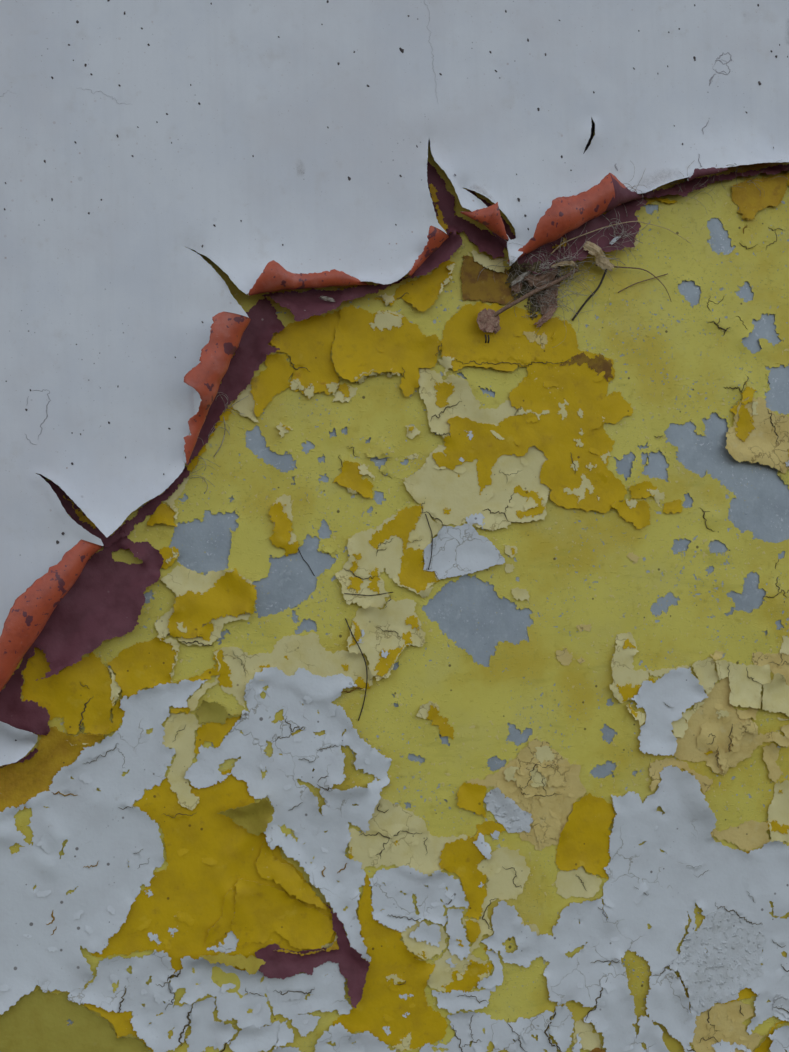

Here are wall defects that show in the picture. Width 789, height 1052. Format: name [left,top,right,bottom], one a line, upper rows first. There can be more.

peeling [0,494,370,1052]
peeling [0,0,789,812]